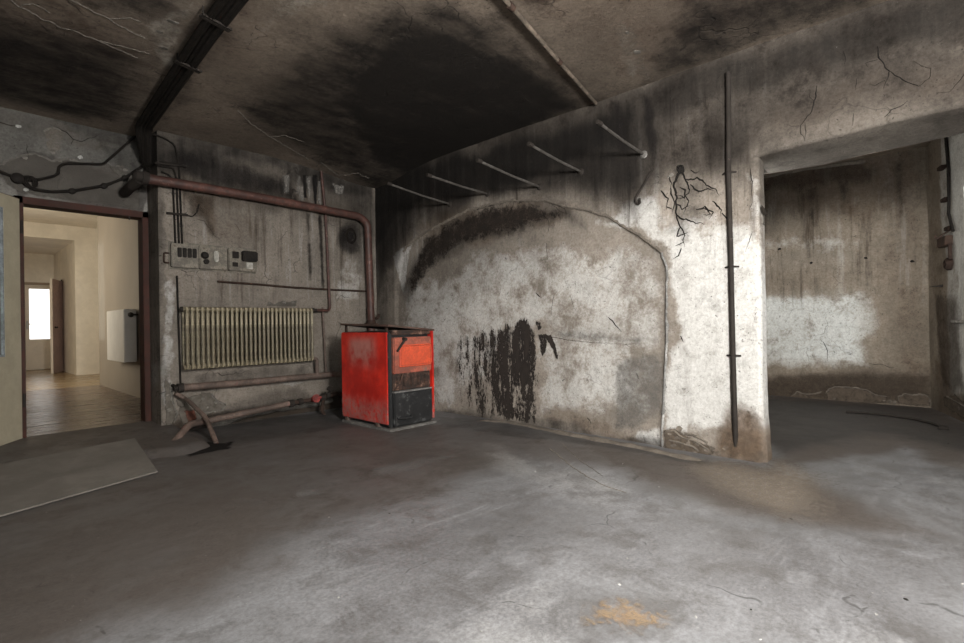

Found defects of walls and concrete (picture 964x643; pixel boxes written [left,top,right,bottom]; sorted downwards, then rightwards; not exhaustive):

crack [11,0,149,58]
crack [843,46,964,116]
crack [661,165,727,258]
spalling [403,198,728,455]
damp [937,299,962,388]
spalling [790,386,931,406]